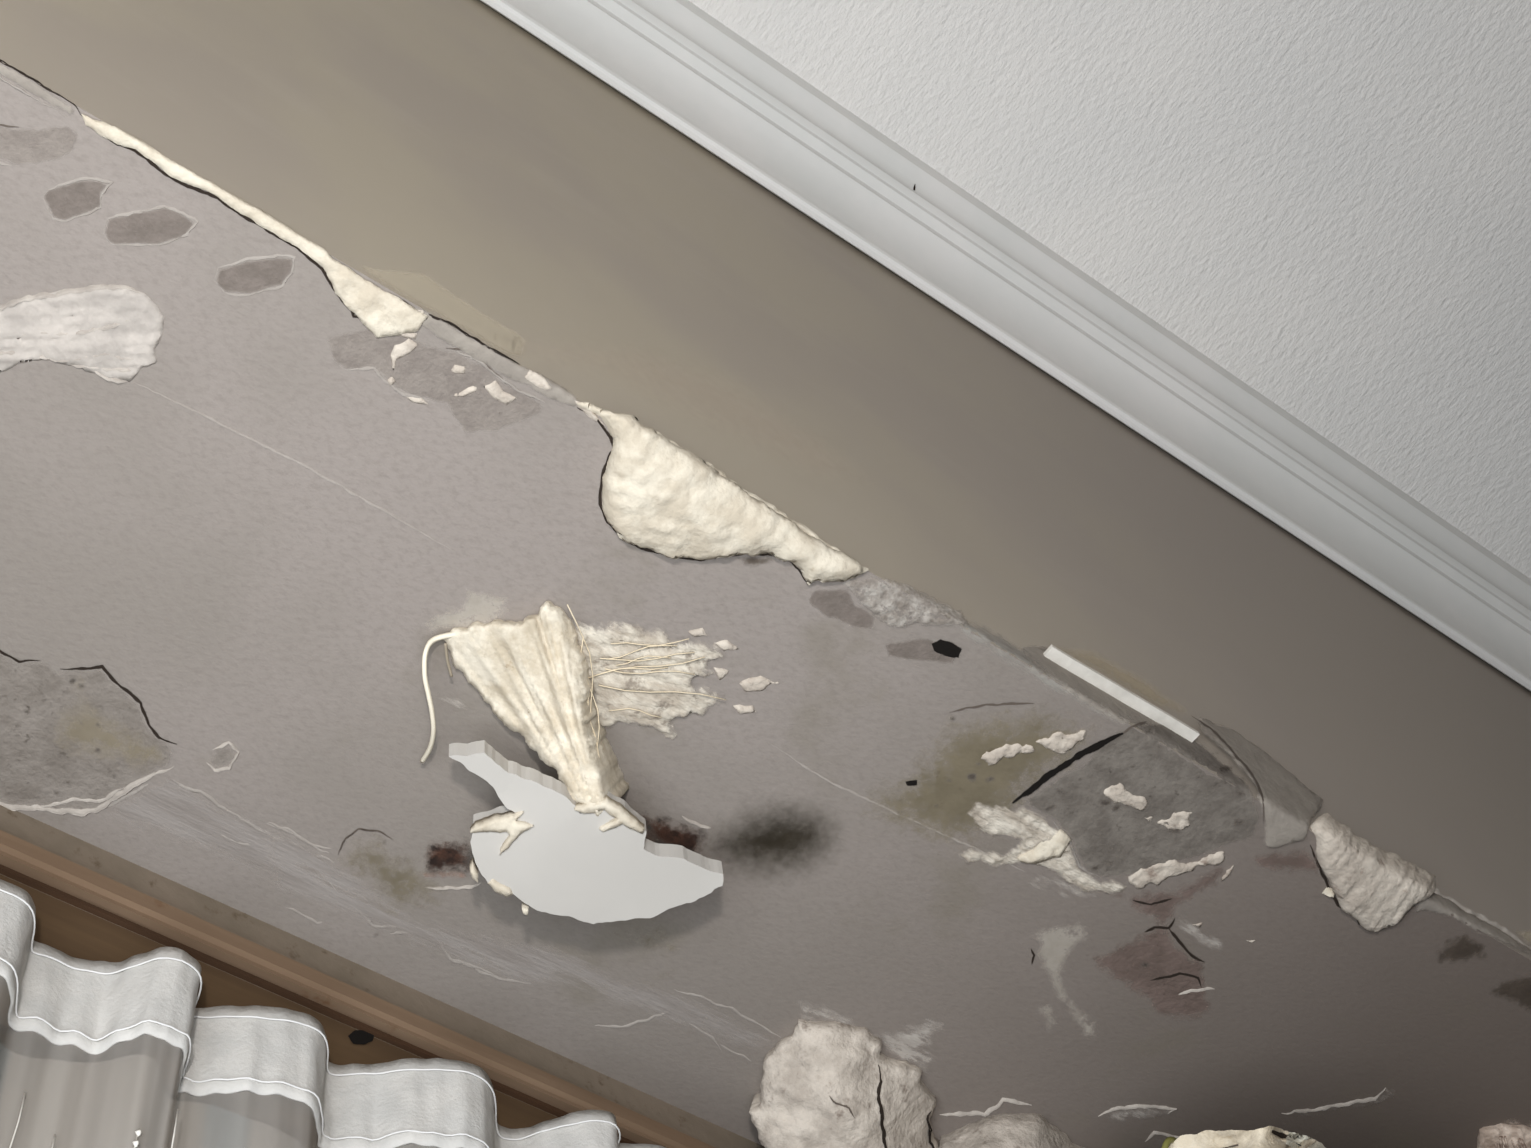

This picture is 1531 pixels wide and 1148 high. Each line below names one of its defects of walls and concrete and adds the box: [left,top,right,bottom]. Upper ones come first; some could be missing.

peeling [0,59,82,166]
peeling [42,177,199,247]
peeling [215,254,296,297]
leakage [881,702,1080,838]
spalling [810,578,1531,1017]
crack [830,1065,887,1148]
crack [926,1110,935,1148]
spalling [1169,1126,1326,1148]